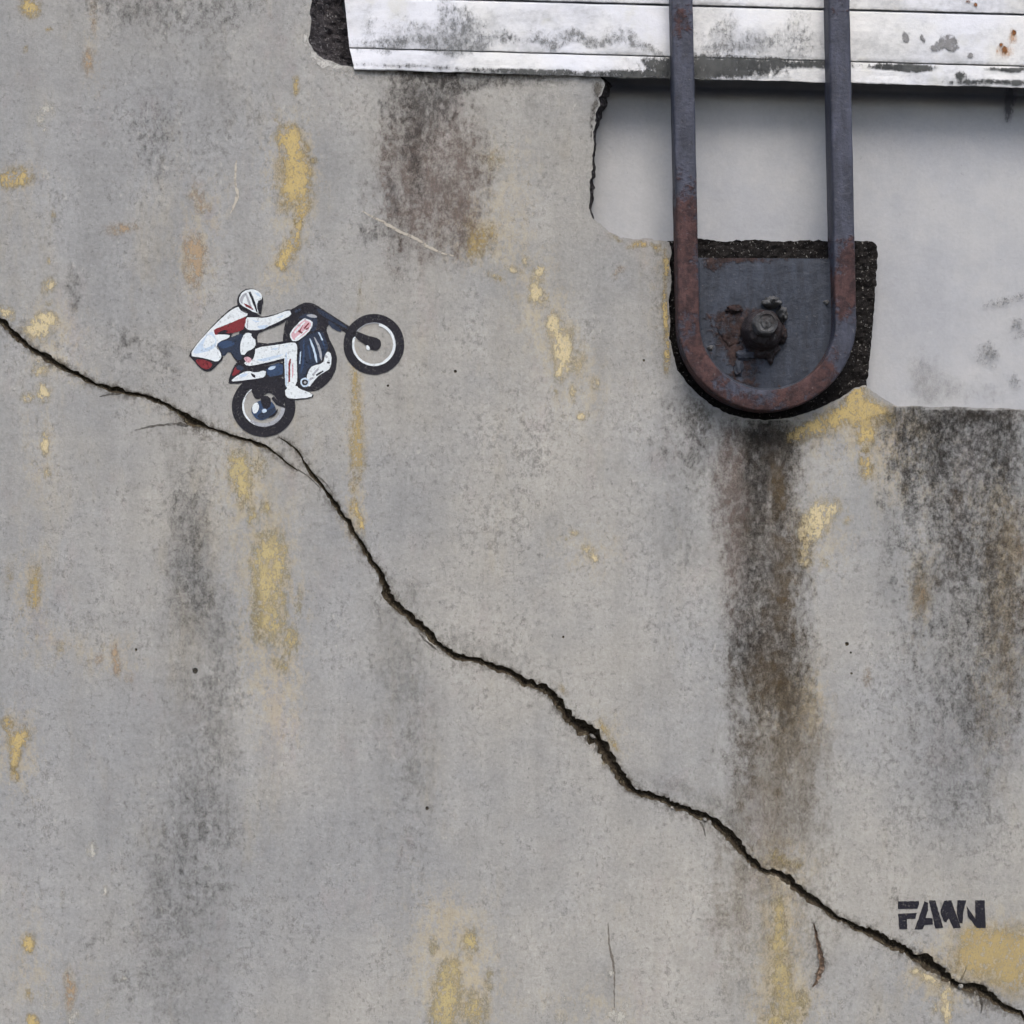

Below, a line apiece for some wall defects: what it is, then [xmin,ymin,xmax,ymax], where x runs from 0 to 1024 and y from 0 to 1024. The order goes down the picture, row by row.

spalling [304,0,353,77]
leakage [357,6,671,258]
spalling [589,77,612,219]
leakage [694,19,825,80]
leakage [869,63,936,73]
leakage [942,67,1024,122]
peeling [546,313,585,396]
peeling [632,240,670,371]
rust [707,296,788,377]
crack [0,318,1024,1020]
leakage [713,420,812,805]
leakage [885,406,1024,735]